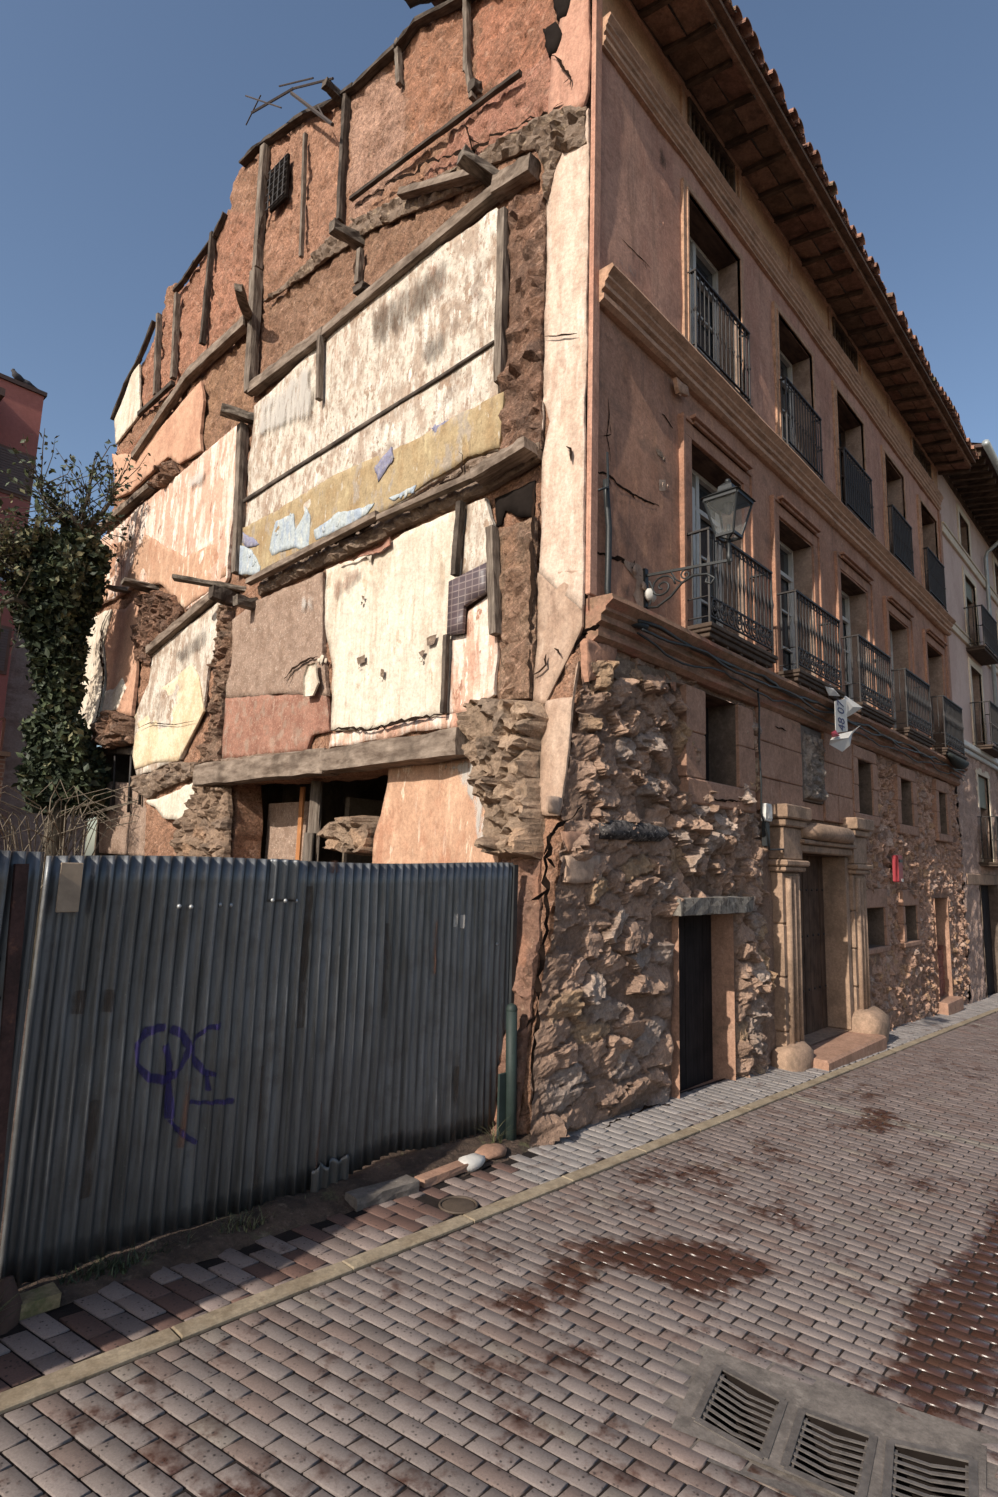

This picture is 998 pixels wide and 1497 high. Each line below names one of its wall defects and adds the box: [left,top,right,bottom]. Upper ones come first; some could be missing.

flaking render [132,663,205,769]
spalling [613,657,679,693]
crack [526,806,582,1104]